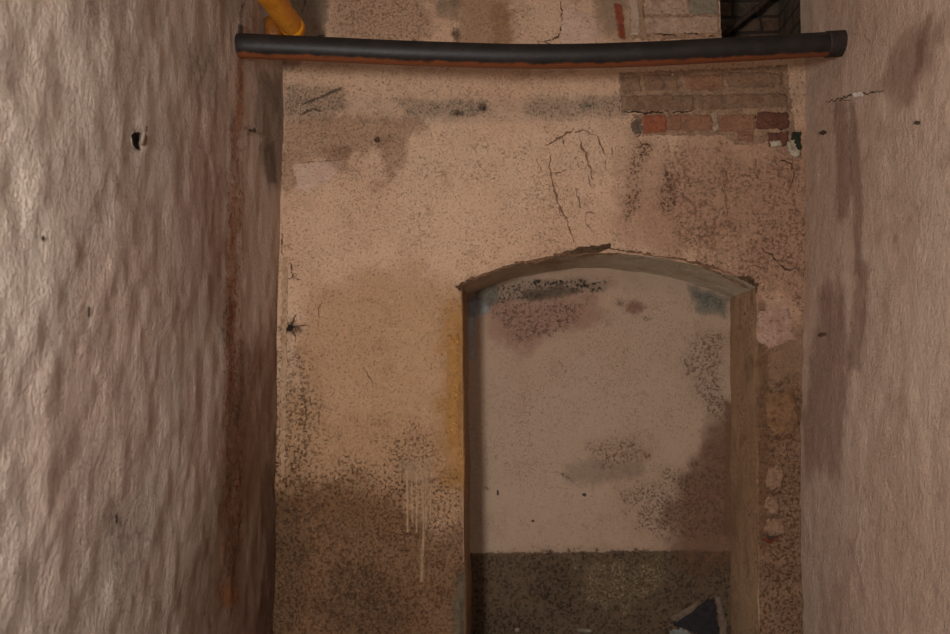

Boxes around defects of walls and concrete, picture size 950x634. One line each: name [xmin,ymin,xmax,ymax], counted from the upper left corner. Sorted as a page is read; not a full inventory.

crack [537,2,563,44]
crack [537,128,613,242]
flaking render [618,64,802,217]
rust [219,58,250,607]
leakage [209,278,732,634]
leakage [757,340,804,634]